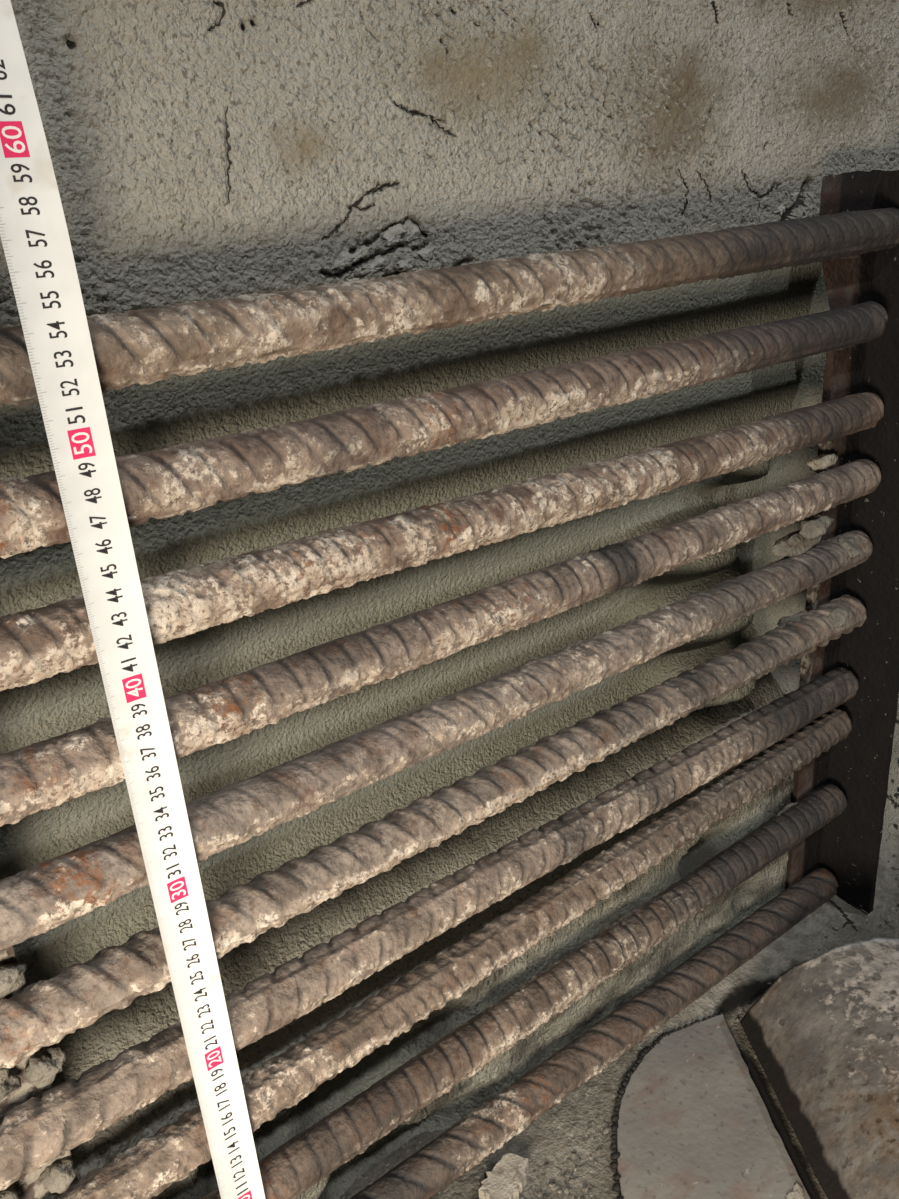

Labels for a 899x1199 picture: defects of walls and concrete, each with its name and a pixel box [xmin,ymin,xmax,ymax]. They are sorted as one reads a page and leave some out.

crack [225,107,233,203]
crack [322,184,380,240]
crack [678,169,711,215]
crack [742,172,782,211]
flaking render [322,218,434,282]
spalling [887,779,899,830]
peeling [786,1182,804,1199]